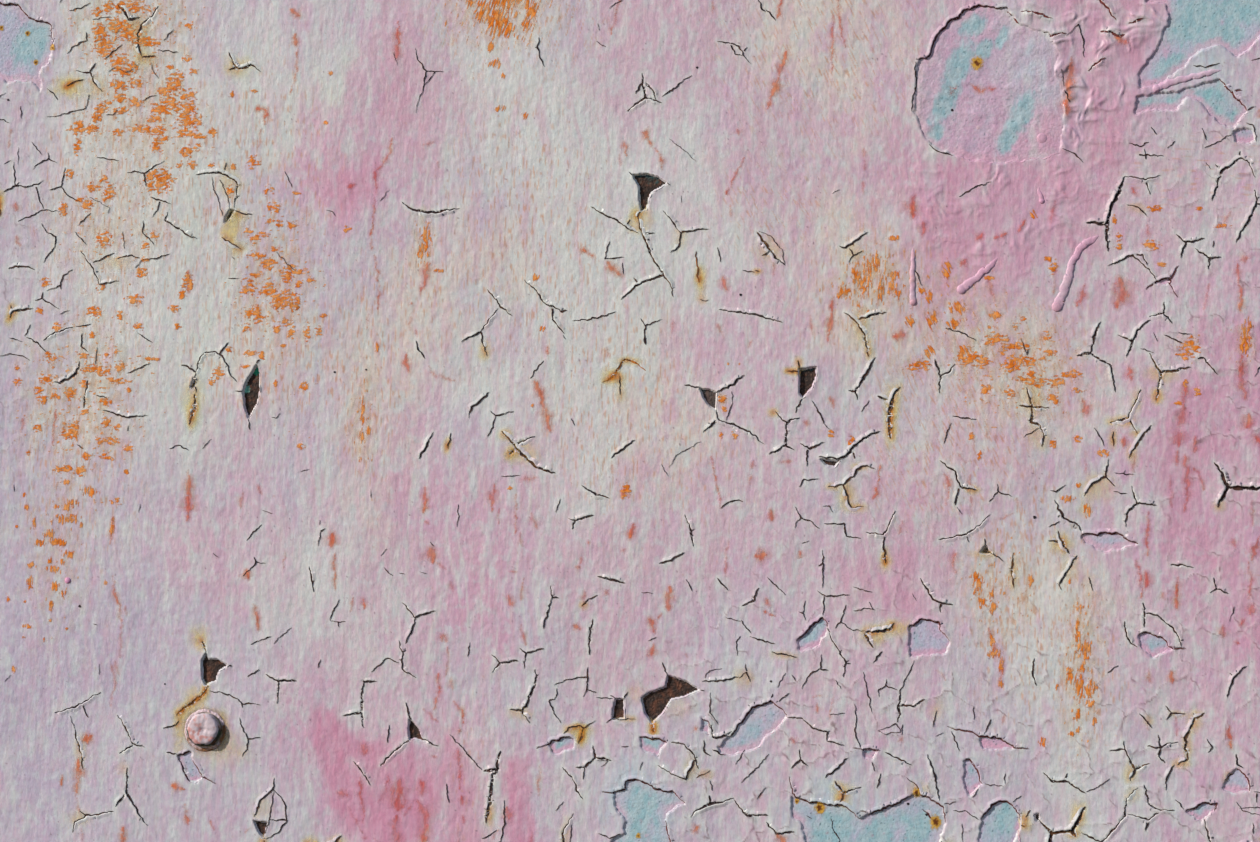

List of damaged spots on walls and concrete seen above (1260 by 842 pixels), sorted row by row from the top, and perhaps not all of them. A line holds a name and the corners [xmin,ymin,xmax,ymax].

corrosion [445,0,552,78]
peeling [916,1,1065,164]
corrosion [7,0,217,630]
crack [0,0,250,431]
corrosion [223,186,327,368]
peeling [632,173,666,212]
corrosion [819,235,1089,428]
crack [417,392,608,529]
crack [467,309,1260,842]
crack [343,542,506,841]
peeling [639,676,700,756]
peeling [789,777,948,842]